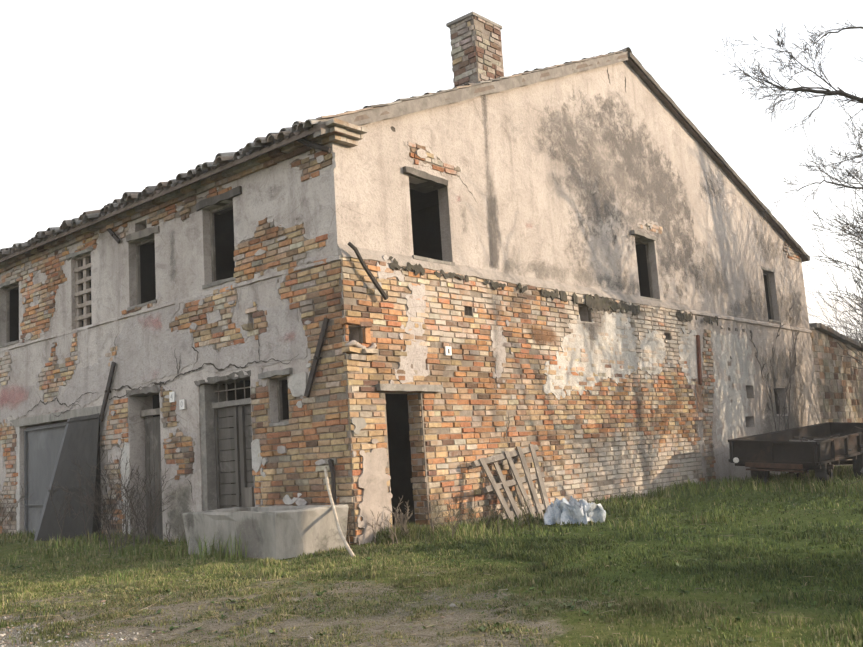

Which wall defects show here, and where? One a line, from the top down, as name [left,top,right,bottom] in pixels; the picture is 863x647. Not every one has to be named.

spalling [285,148,336,182]
spalling [404,141,462,179]
water stain [487,173,500,267]
water stain [538,104,698,276]
crack [18,329,299,419]
spalling [0,213,357,545]
peeling [375,255,429,384]
peeling [490,320,513,388]
peeling [542,311,756,483]